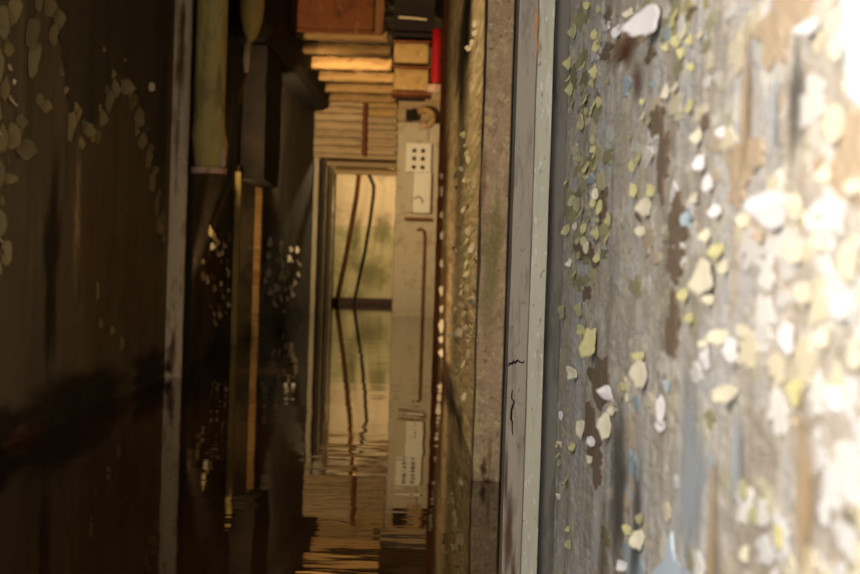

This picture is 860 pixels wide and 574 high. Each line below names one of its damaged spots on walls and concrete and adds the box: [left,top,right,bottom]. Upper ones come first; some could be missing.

peeling [0,0,172,277]
peeling [554,0,860,574]